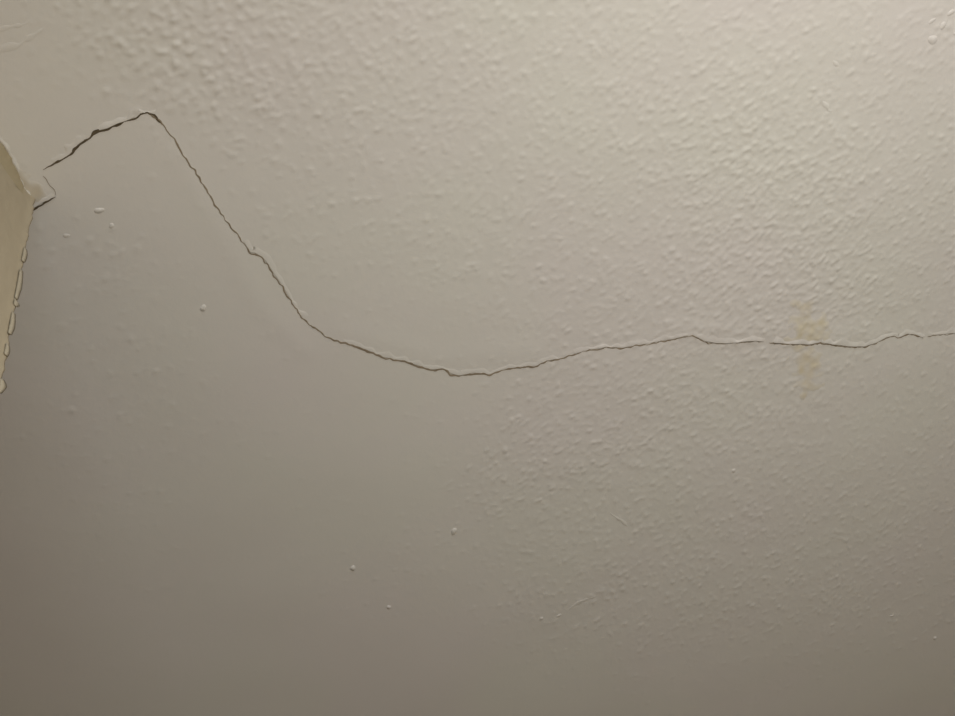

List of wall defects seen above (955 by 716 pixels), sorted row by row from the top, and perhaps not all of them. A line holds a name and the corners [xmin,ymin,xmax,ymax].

crack [33,108,955,377]